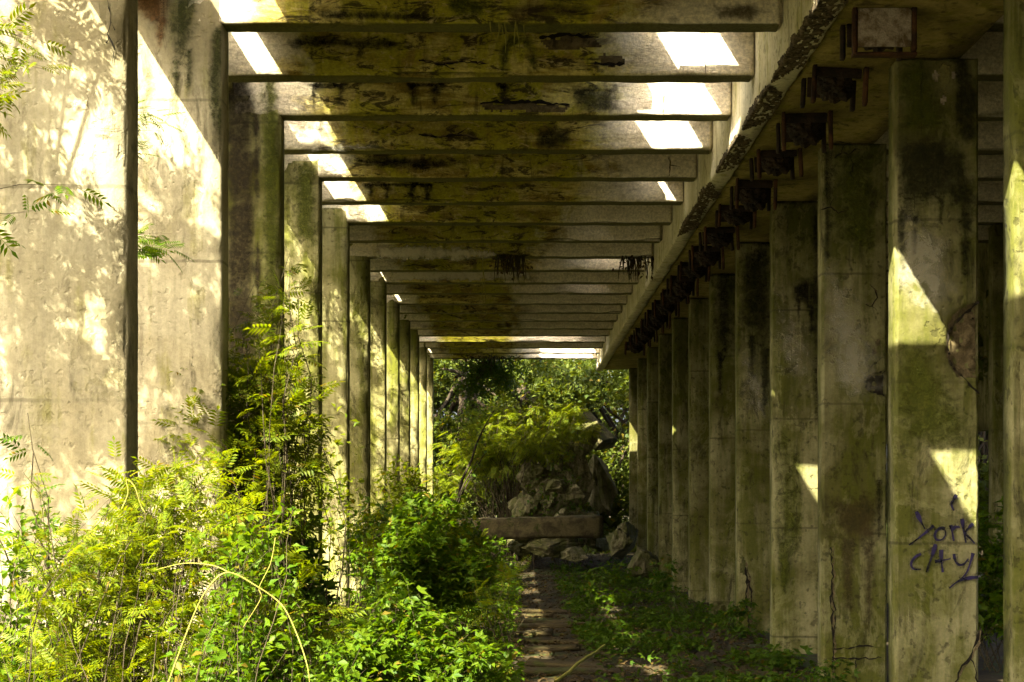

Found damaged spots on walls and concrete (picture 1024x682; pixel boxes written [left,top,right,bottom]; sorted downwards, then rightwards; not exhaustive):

leakage [290,36,400,59]
leakage [308,83,348,109]
leakage [335,144,464,170]
leakage [574,85,616,111]
spalling [677,0,849,237]
leakage [953,56,977,140]
leakage [211,82,260,423]
spalling [945,300,980,394]
leakage [835,480,883,620]
crack [744,562,753,633]
crack [829,547,881,682]
crack [955,626,982,682]